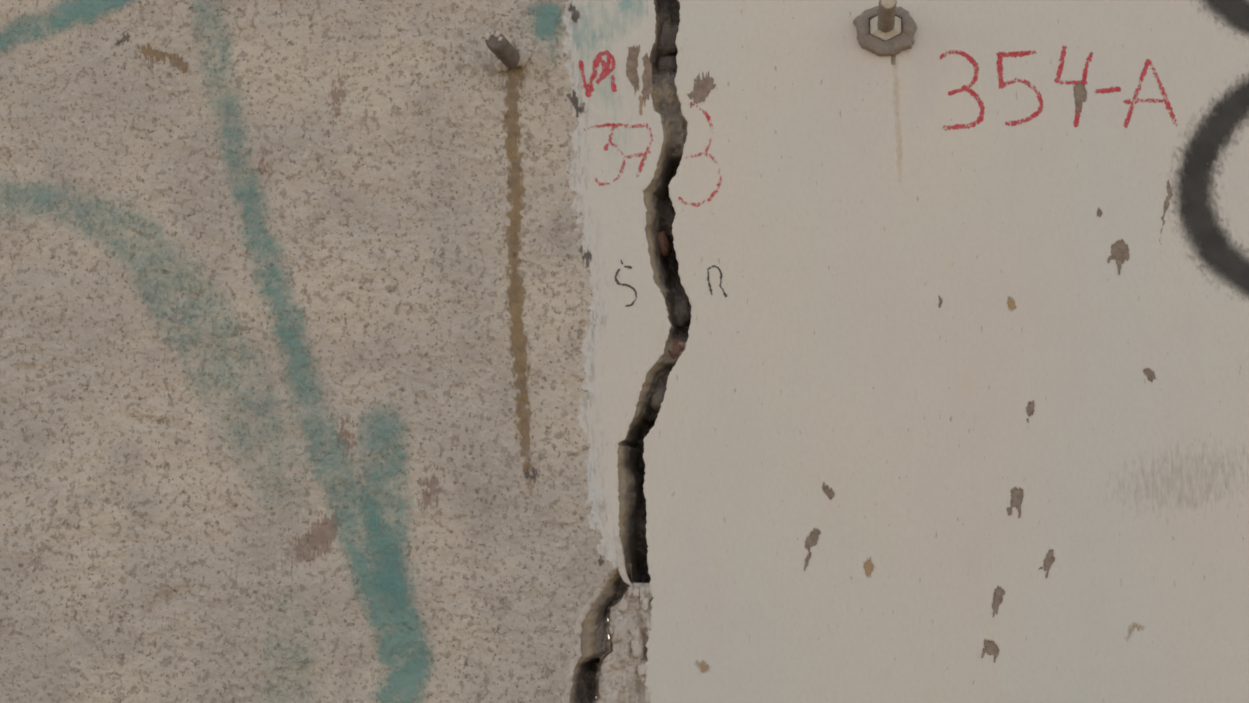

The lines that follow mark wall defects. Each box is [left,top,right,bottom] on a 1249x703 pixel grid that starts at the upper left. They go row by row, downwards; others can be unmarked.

corrosion [503,67,533,471]
peeling [1107,239,1129,275]
crack [561,0,691,703]
peeling [1007,487,1023,518]
peeling [804,528,821,571]
peeling [1039,549,1055,578]
peeling [992,586,1005,617]
spalling [593,583,653,703]
peeling [981,639,999,663]